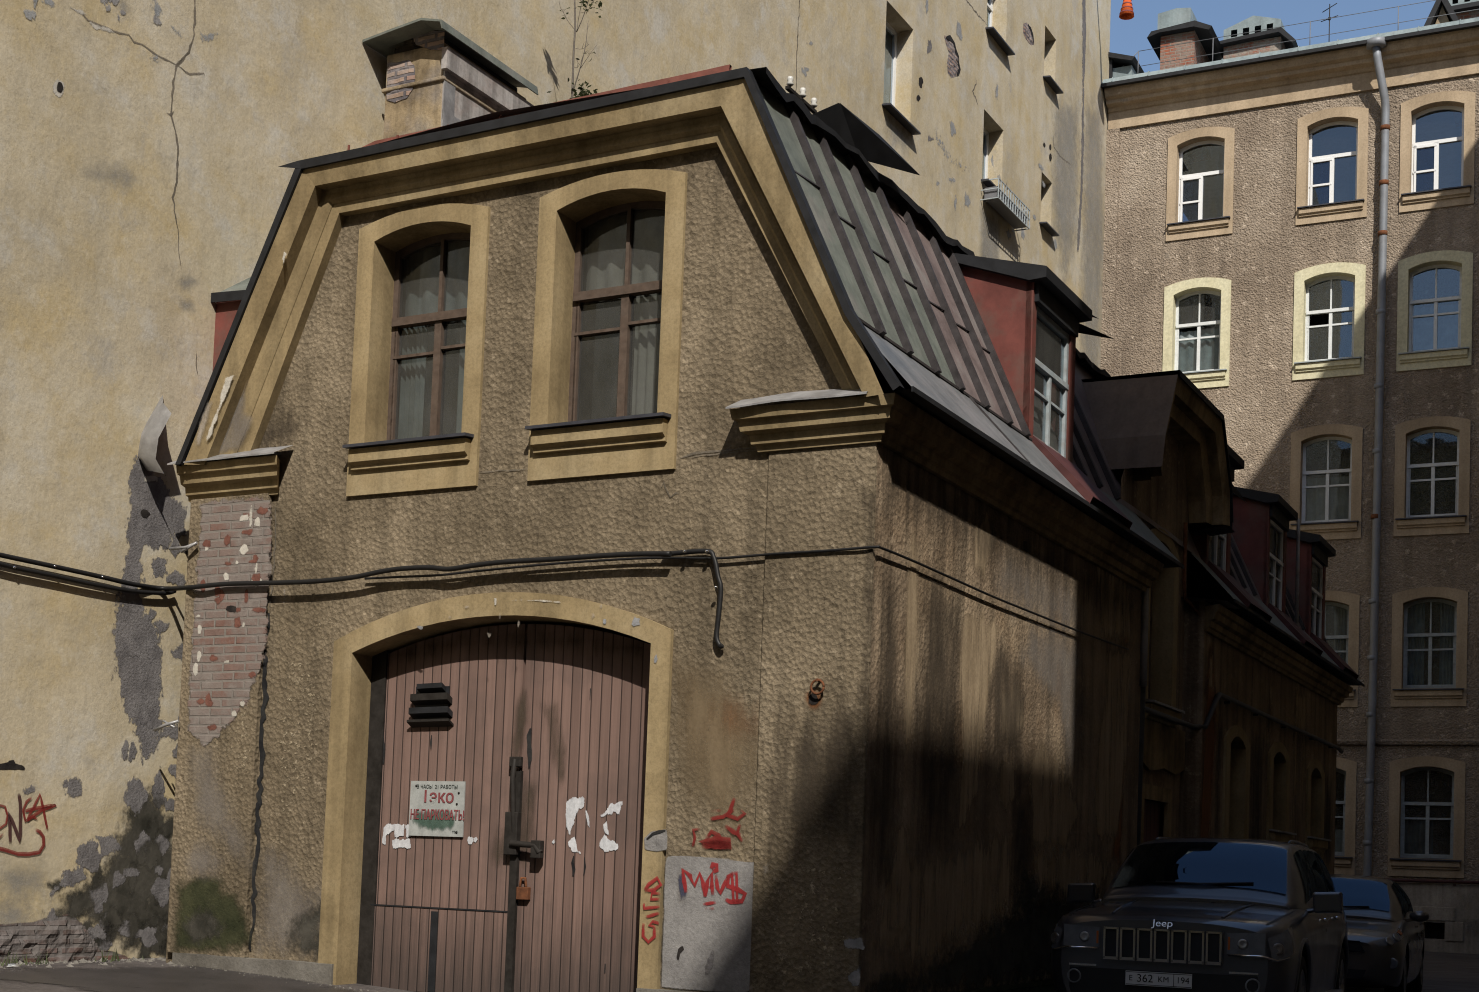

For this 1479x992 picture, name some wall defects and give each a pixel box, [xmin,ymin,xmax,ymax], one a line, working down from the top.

crack [72,0,204,265]
flaking render [153,0,181,36]
flaking render [111,455,272,765]
flaking render [63,777,82,797]
leakage [867,532,1130,992]
flaking render [0,914,131,963]